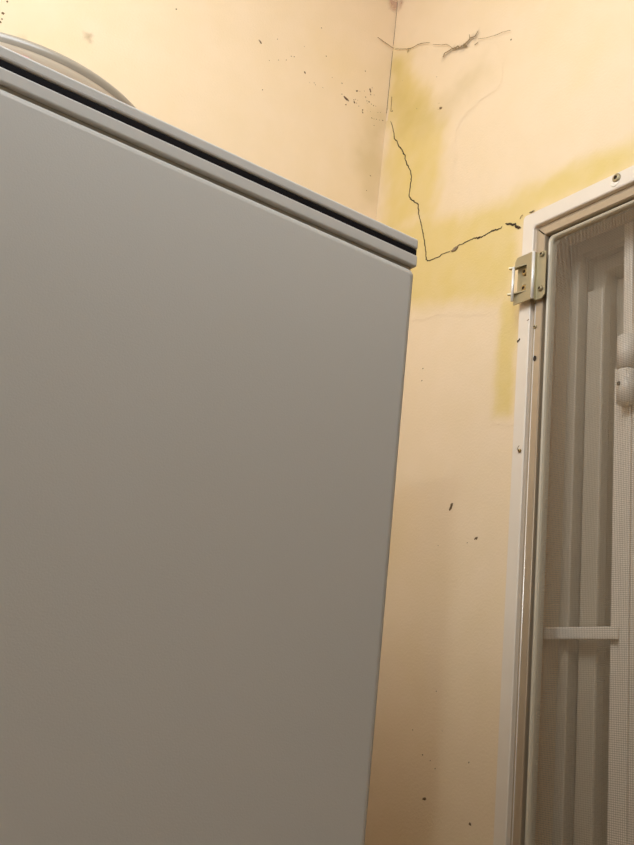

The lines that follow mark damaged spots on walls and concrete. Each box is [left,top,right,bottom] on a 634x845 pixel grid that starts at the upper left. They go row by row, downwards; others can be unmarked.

crack [386,3,534,261]